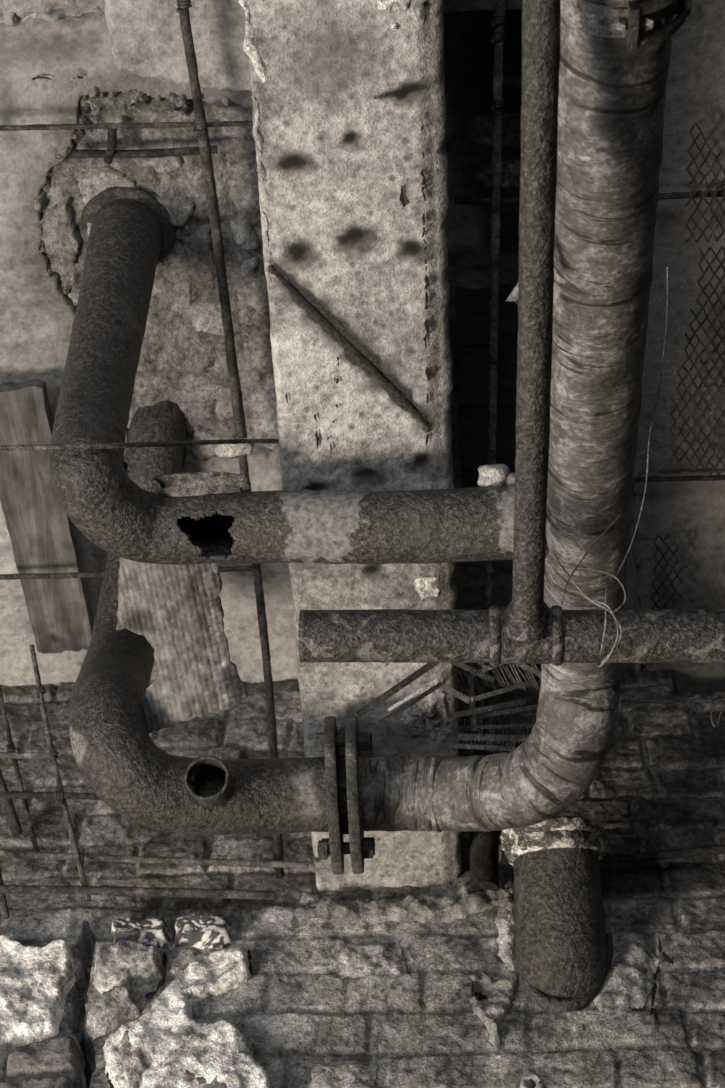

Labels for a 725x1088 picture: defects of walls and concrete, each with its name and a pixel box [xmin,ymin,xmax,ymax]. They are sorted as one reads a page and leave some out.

spalling [239,0,268,83]
spalling [32,85,279,460]
flaking render [0,934,76,1082]
flaking render [103,946,273,1088]
crack [650,937,674,1025]